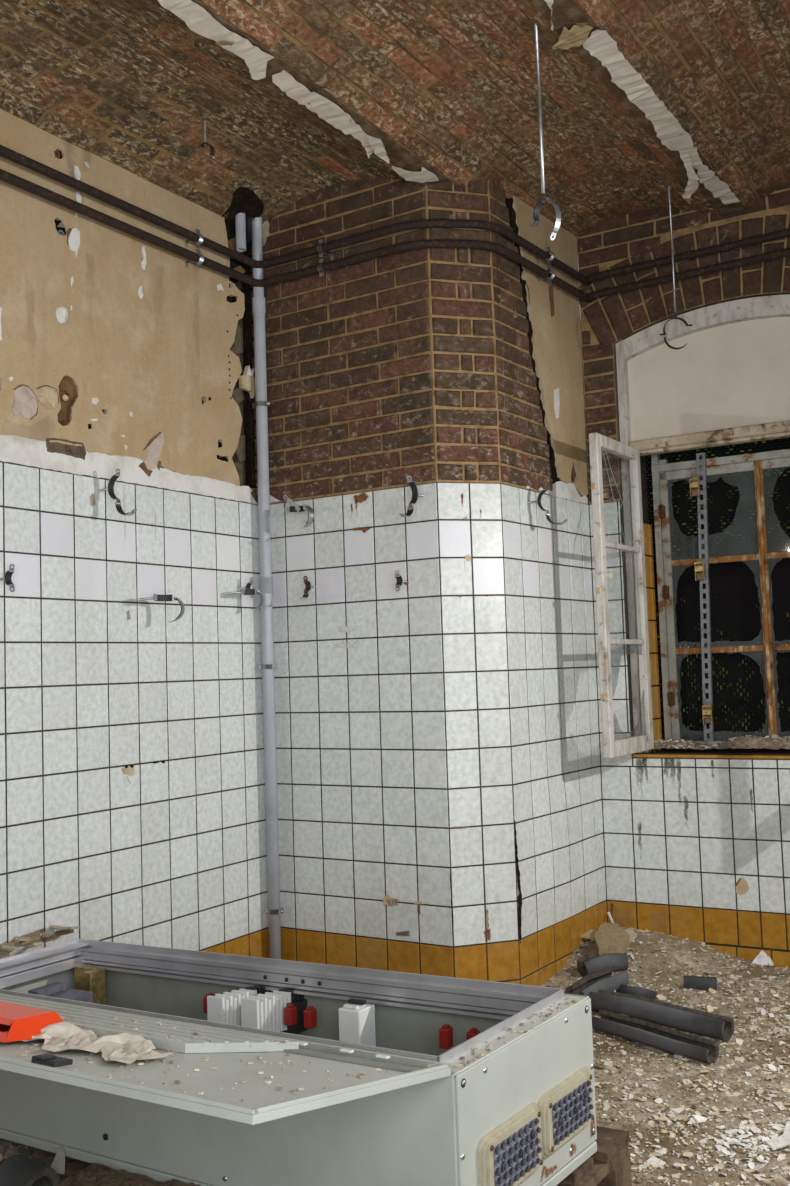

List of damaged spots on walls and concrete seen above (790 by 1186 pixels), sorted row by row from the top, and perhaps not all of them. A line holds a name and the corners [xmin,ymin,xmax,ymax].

peeling [158,0,439,183]
peeling [544,0,740,207]
flaking render [56,305,72,325]
flaking render [46,376,86,460]
peeling [139,432,164,477]
flaking render [217,219,270,488]
crack [505,197,560,484]
crack [514,820,522,944]